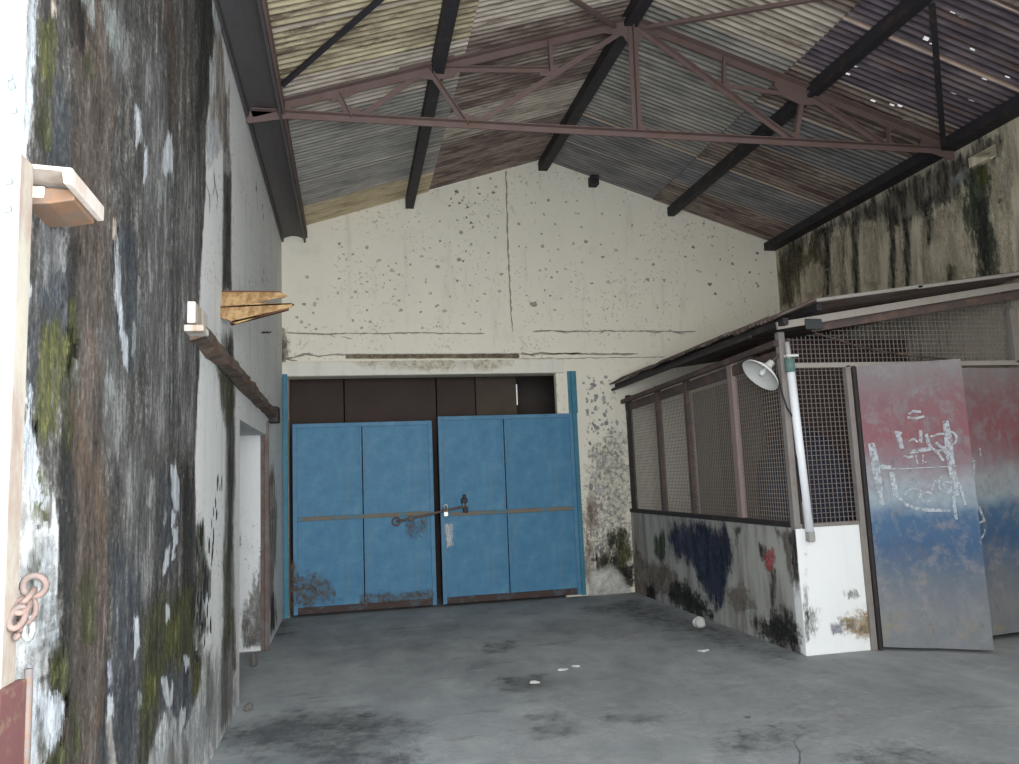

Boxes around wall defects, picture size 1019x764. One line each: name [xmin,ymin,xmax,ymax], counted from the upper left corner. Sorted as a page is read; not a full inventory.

leakage [779,135,1004,308]
leakage [20,0,261,764]
peeling [163,465,179,575]
leakage [584,430,678,597]
corrosion [290,562,336,611]
leakage [728,582,817,655]
peeling [161,676,186,736]
leakage [237,714,403,764]